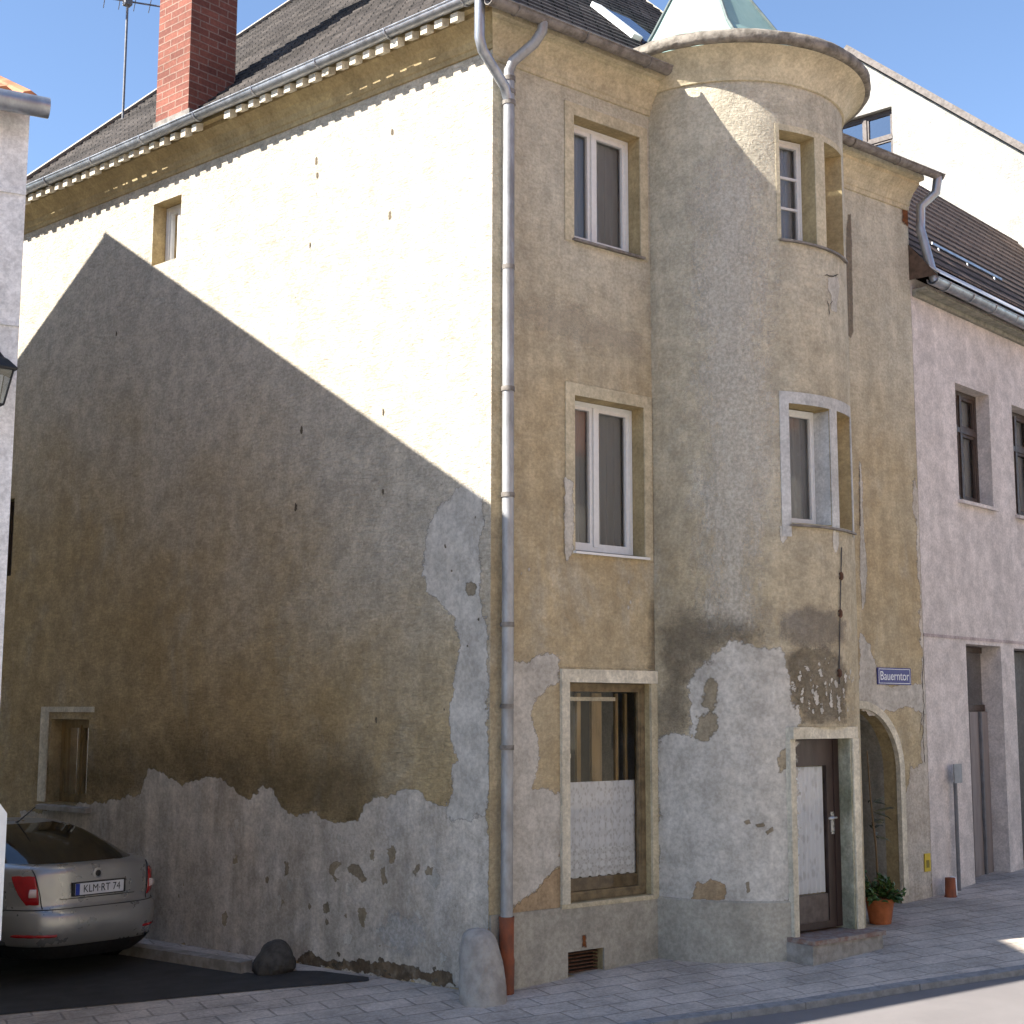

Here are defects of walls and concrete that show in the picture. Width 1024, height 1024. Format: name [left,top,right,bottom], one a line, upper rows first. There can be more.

spalling [451,570,477,596]
peeling [791,658,854,721]
flaking render [20,768,489,988]
peeling [513,868,560,913]